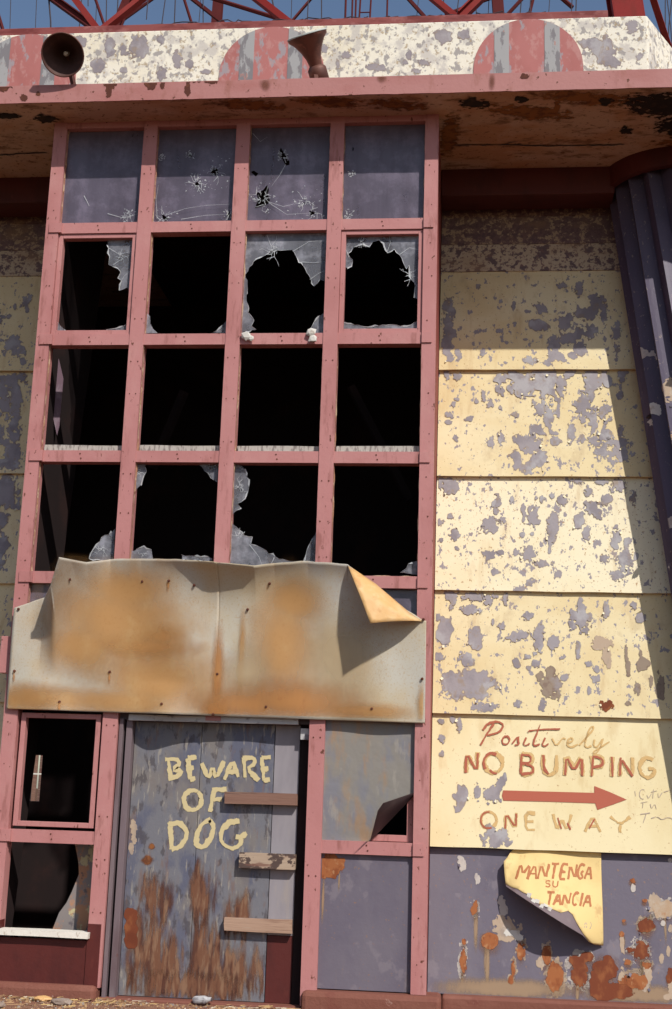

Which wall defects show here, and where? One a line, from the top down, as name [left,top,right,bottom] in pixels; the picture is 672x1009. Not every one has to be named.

peeling [90,34,165,98]
peeling [144,49,218,97]
water stain [599,92,672,139]
peeling [474,281,635,475]
peeling [477,493,568,587]
peeling [570,478,637,543]
corrosion [8,570,199,712]
corrosion [206,582,396,717]
peeling [435,591,665,713]
corrosion [124,843,263,1000]
corrosion [321,854,345,917]
corrosion [447,932,672,1003]